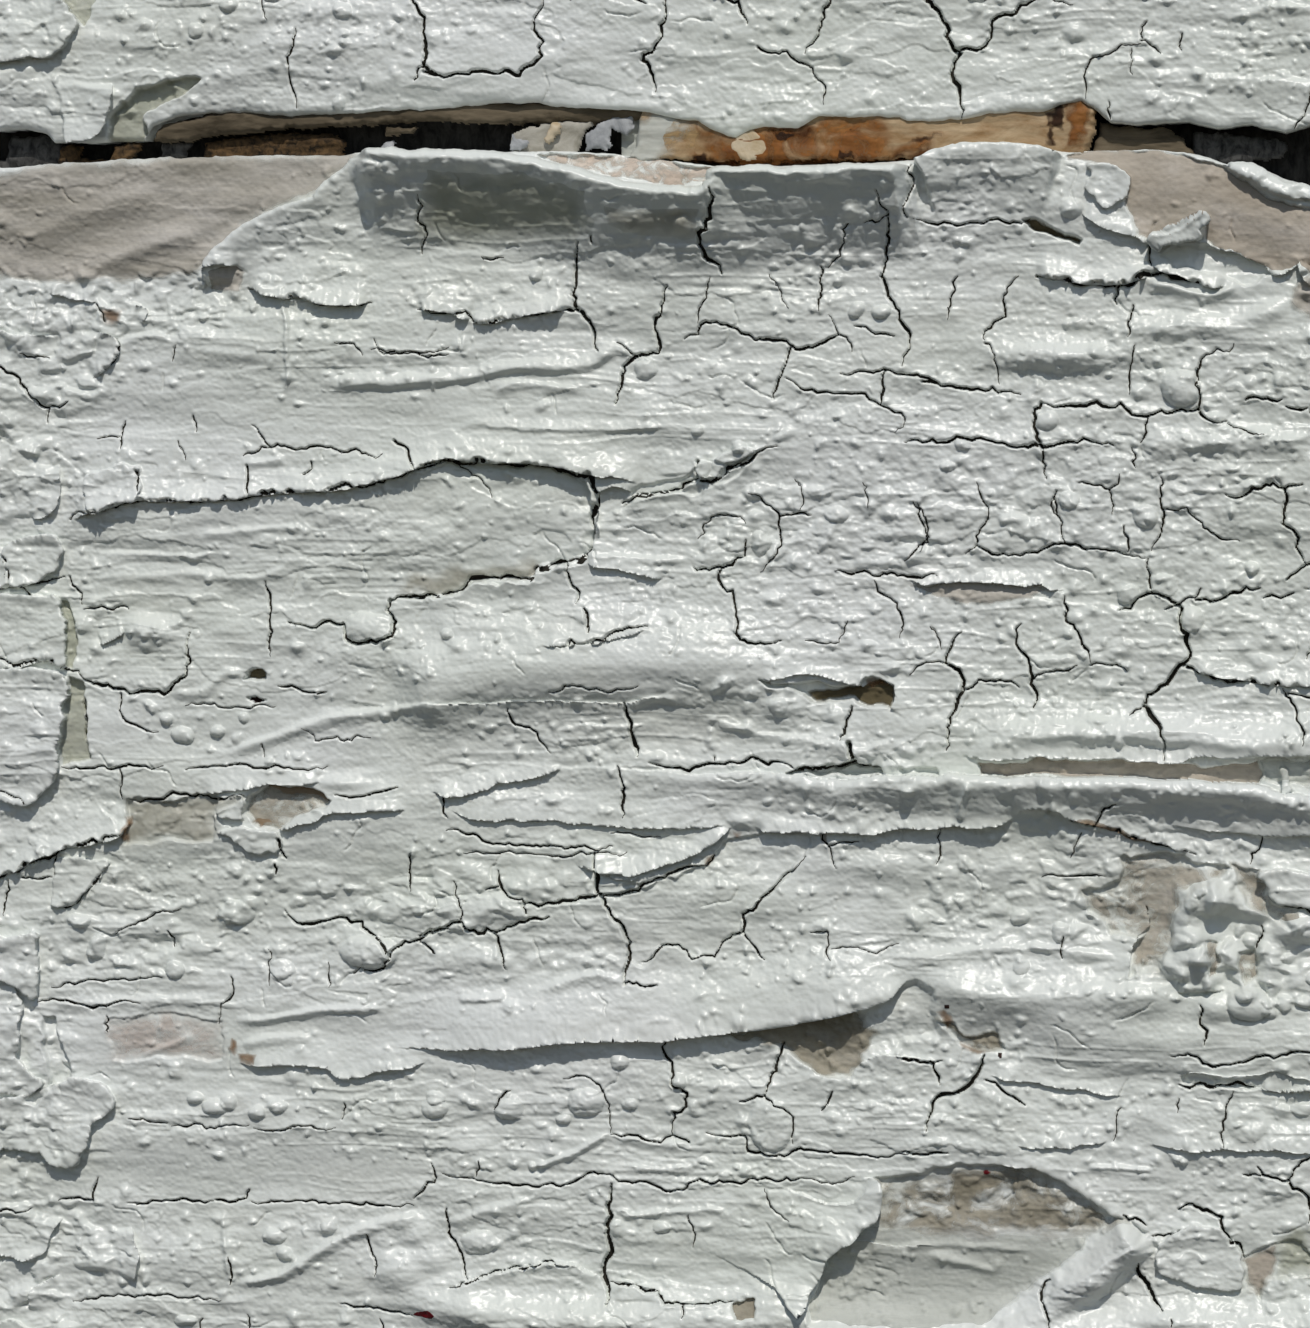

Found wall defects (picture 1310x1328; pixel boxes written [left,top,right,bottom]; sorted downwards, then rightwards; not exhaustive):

crack [412,0,544,80]
crack [925,0,1073,118]
peeling [0,115,1310,333]
crack [71,420,848,653]
crack [417,165,1310,760]
peeling [768,659,871,687]
peeling [249,785,400,830]
crack [285,685,878,988]
peeling [580,743,1310,990]
peeling [244,963,903,1080]
crack [128,1042,1025,1328]
peeling [761,1169,1275,1328]